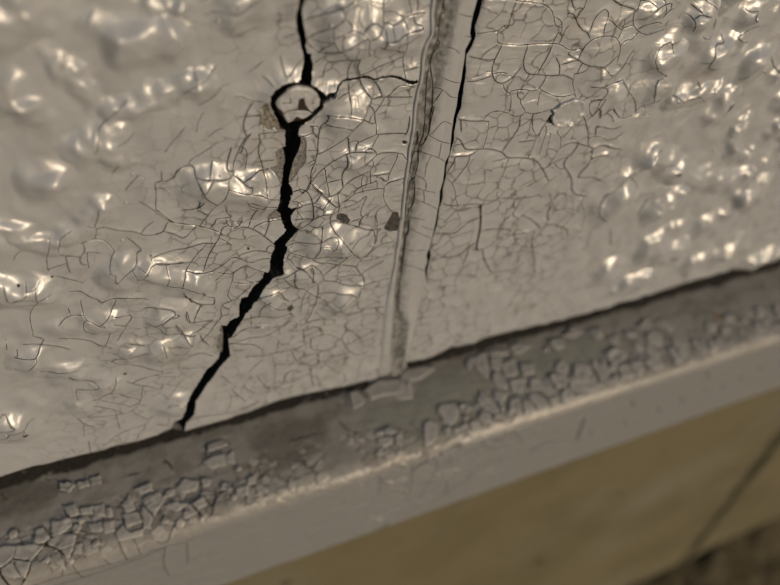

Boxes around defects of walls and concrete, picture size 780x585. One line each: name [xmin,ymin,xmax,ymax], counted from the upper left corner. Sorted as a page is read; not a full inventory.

crack [2,0,759,454]
peeling [348,306,780,449]
peeling [0,440,242,579]